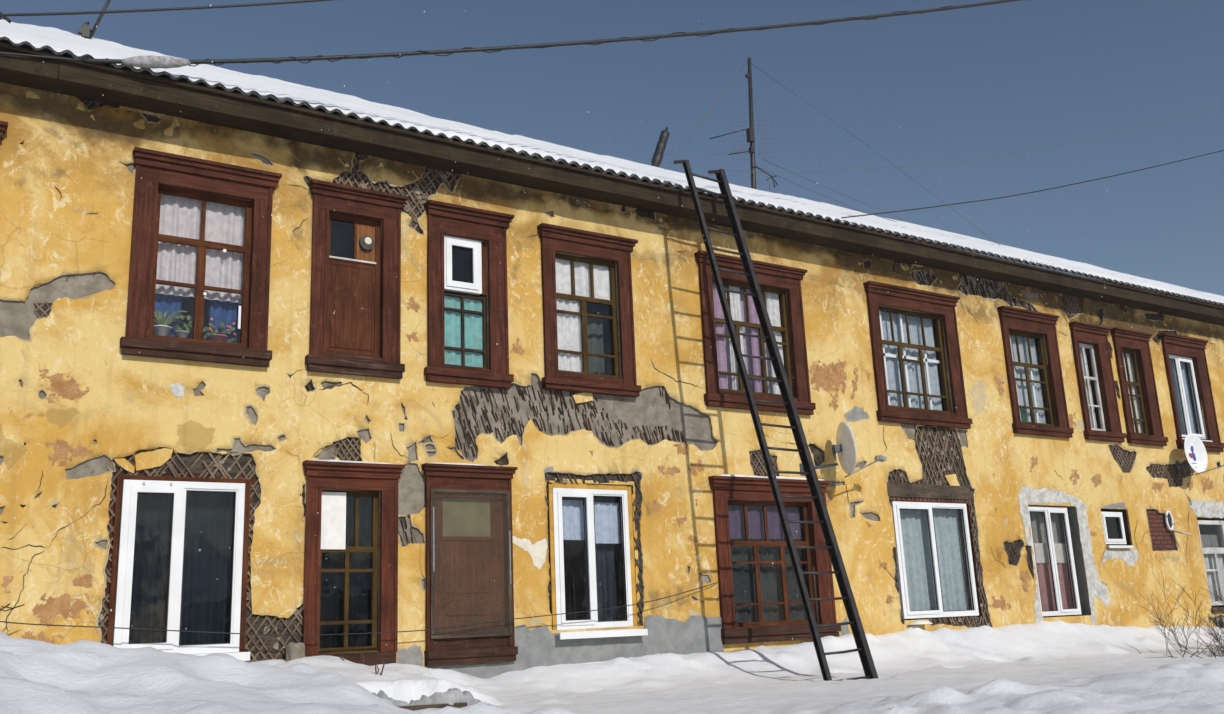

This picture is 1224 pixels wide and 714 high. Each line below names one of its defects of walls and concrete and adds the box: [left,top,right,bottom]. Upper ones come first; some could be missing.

flaking render [332,153,461,236]
flaking render [0,272,115,341]
flaking render [244,384,271,426]
flaking render [314,416,371,461]
flaking render [398,373,719,547]
flaking render [1105,441,1224,494]
crack [1,477,108,634]
flaking render [22,427,303,662]
flaking render [513,471,664,630]
flaking render [826,424,1011,628]
flaking render [1003,539,1033,592]
flaking render [1146,508,1178,552]